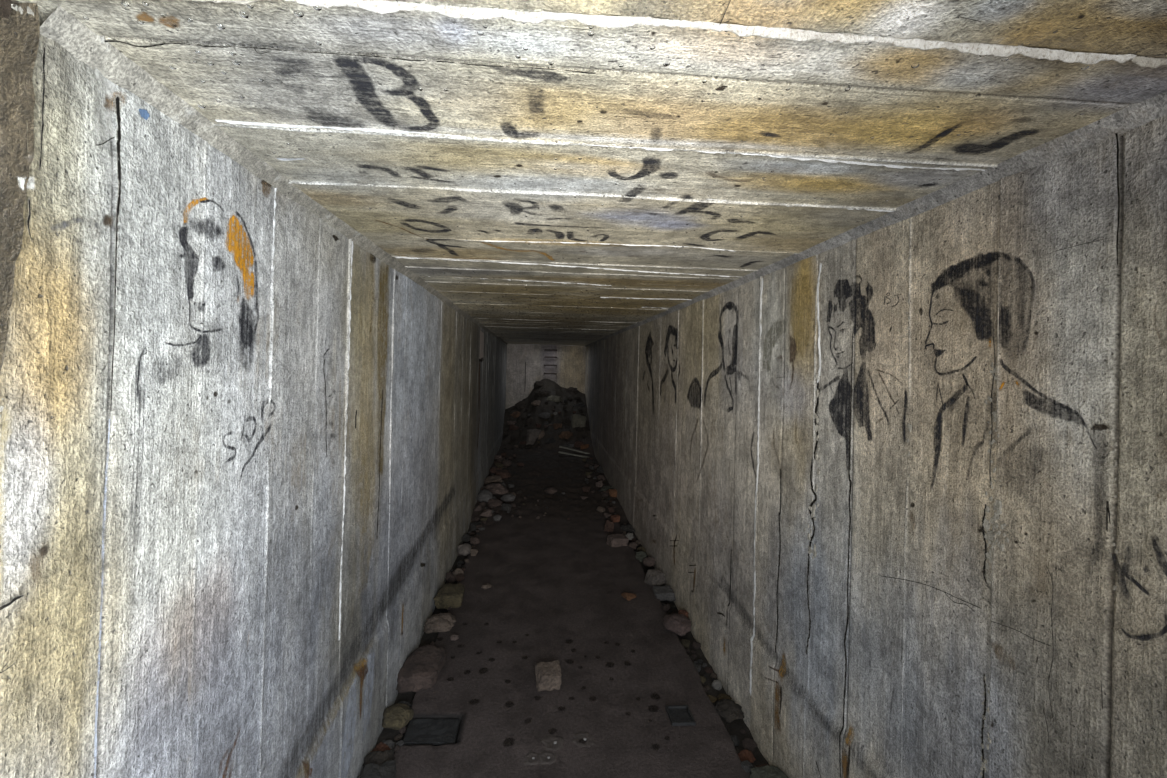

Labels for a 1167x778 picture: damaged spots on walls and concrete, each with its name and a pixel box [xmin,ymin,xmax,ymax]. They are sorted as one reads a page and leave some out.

crack [0,595,24,610]
crack [775,332,853,778]
crack [883,336,1054,744]
corrosion [354,660,368,717]
crack [980,674,988,778]